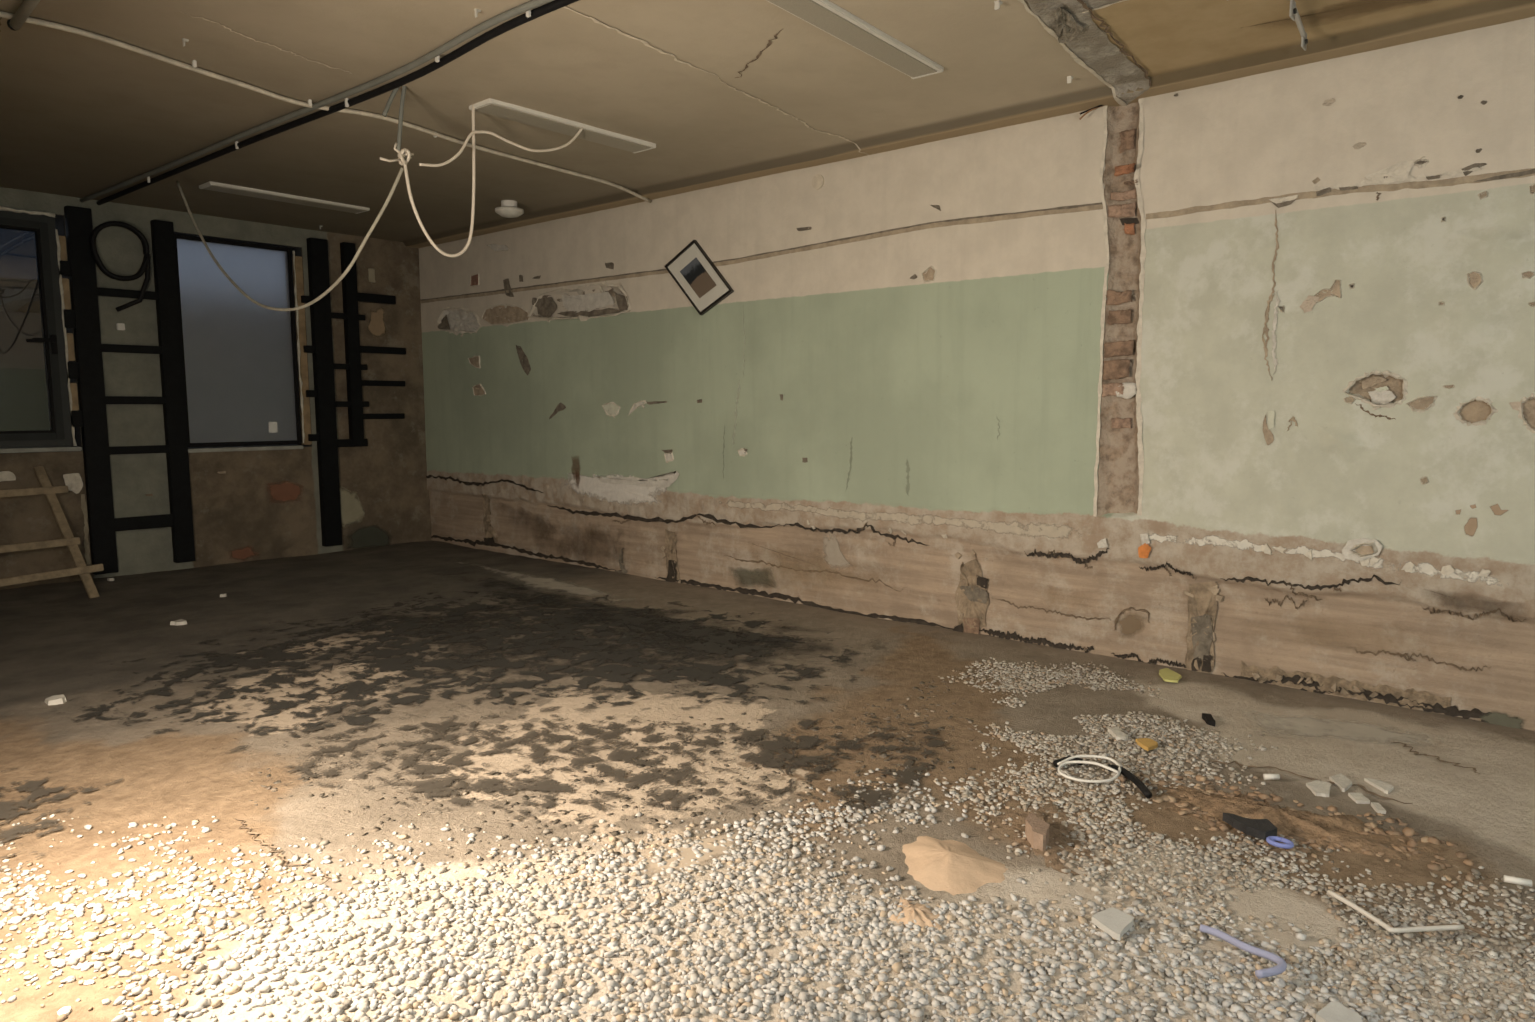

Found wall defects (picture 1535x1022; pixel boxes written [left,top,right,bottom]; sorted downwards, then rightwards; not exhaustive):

flaking render [1093,98,1146,516]
crack [1262,214,1298,445]
spalling [1278,280,1355,313]
spalling [1343,370,1498,426]
spalling [1518,393,1535,434]
crack [426,475,1186,668]
peeling [1138,533,1383,569]
crack [1026,548,1526,622]
peeling [1401,562,1501,586]
peeling [1456,504,1507,536]
leakage [73,567,957,824]
crack [1224,646,1518,774]